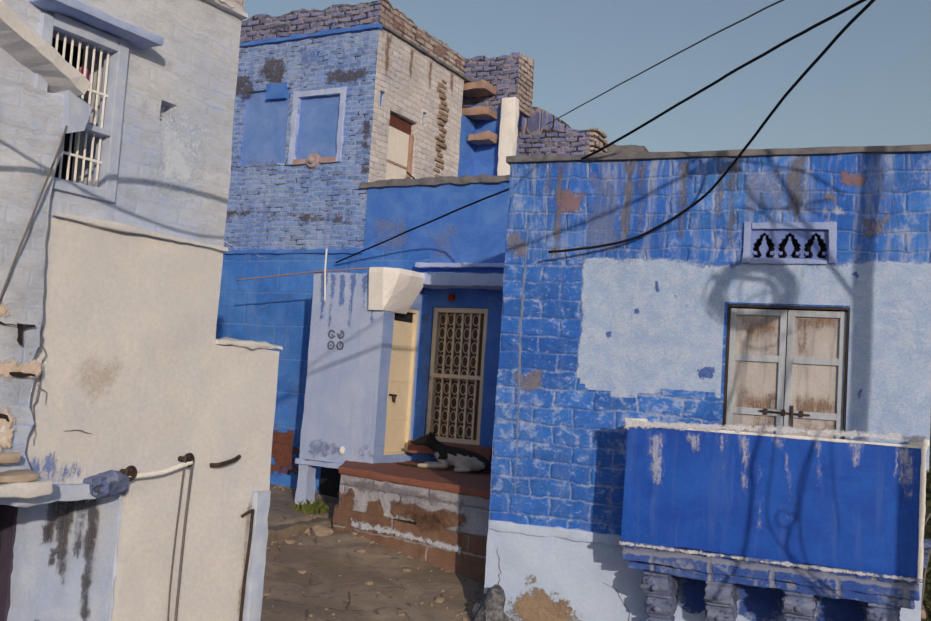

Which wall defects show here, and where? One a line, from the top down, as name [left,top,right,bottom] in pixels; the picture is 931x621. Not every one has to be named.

flaking render [433,80,449,177]
water stain [320,273,368,329]
flaking render [0,357,42,379]
peeling [697,367,715,379]
flaking render [0,406,16,450]
spalling [270,430,300,475]
peeling [337,480,466,533]
water stain [45,499,99,621]